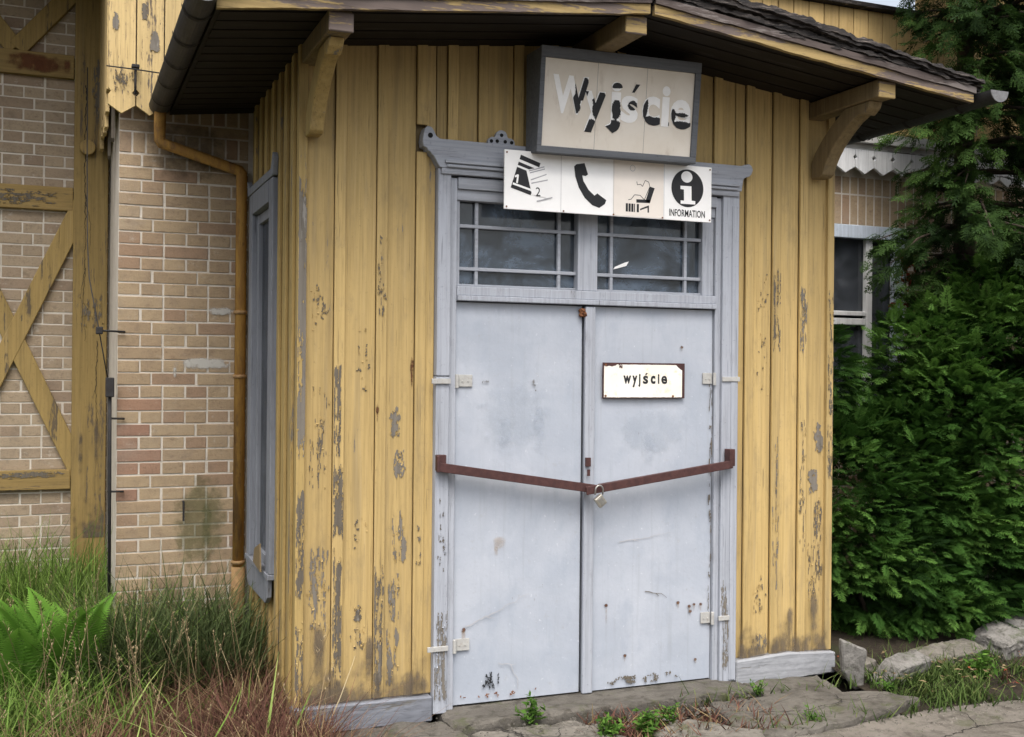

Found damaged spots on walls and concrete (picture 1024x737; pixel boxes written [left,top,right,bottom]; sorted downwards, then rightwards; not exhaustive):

peeling [150,31,160,52]
peeling [757,270,781,375]
peeling [294,176,421,701]
peeling [799,289,834,601]
peeling [434,611,448,703]
peeling [607,671,678,685]